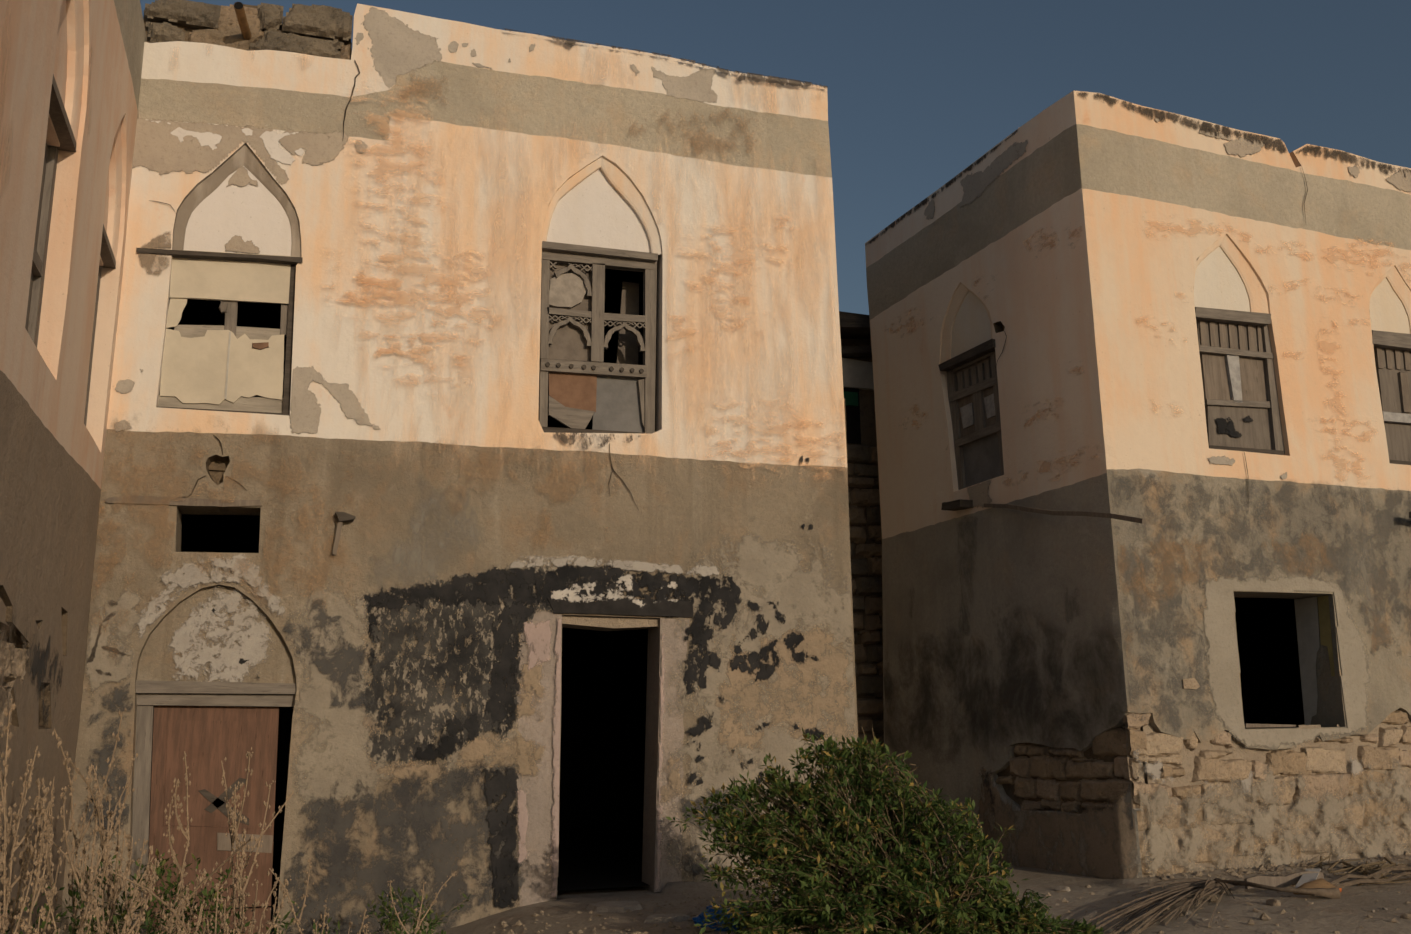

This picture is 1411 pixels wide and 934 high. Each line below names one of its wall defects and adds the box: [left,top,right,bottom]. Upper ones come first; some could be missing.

crack [342,60,360,141]
peeling [355,7,492,88]
peeling [631,64,718,103]
peeling [132,118,368,187]
peeling [960,140,1028,207]
peeling [290,366,381,434]
spalling [175,435,247,498]
water stain [1111,475,1411,730]
spalling [0,585,43,736]
spalling [86,524,856,909]
spalling [1122,709,1411,878]